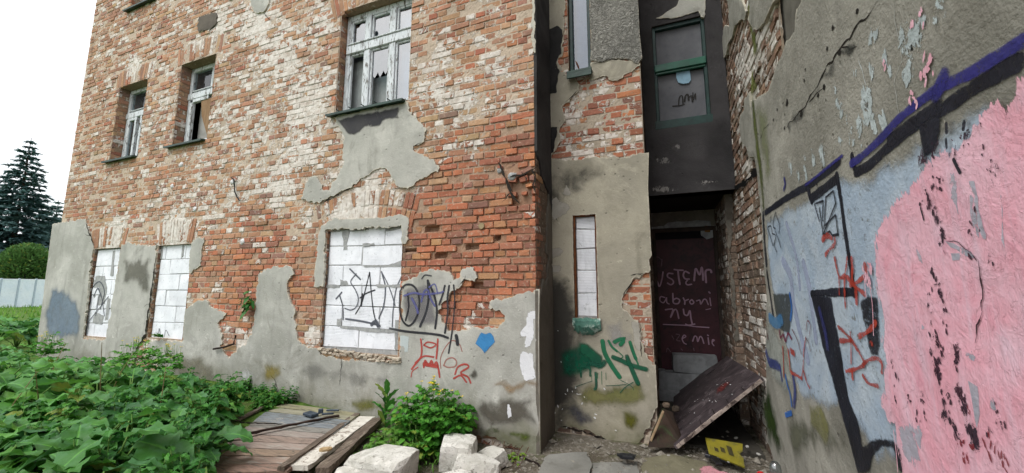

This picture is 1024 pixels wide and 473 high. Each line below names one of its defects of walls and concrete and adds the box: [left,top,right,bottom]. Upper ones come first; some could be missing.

flaking render [36,0,713,455]
flaking render [720,0,792,461]
crack [759,4,902,140]